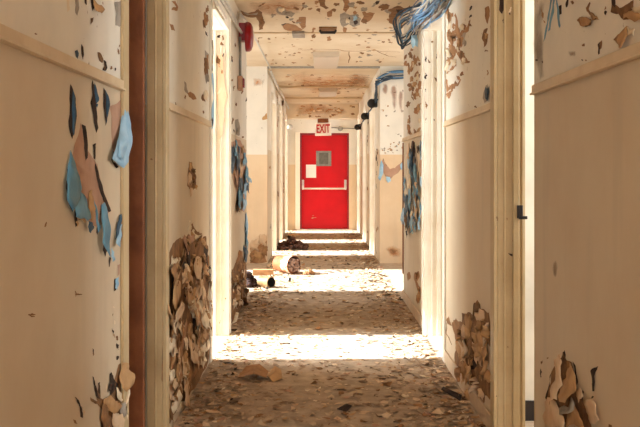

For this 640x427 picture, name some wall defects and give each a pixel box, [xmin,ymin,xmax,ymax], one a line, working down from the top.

peeling [241,0,410,63]
peeling [444,6,472,99]
peeling [577,0,640,49]
peeling [66,84,122,291]
peeling [91,80,133,168]
peeling [184,5,271,323]
peeling [376,48,437,238]
peeling [90,320,135,427]
peeling [162,220,213,424]
peeling [441,300,497,403]
peeling [540,350,599,427]